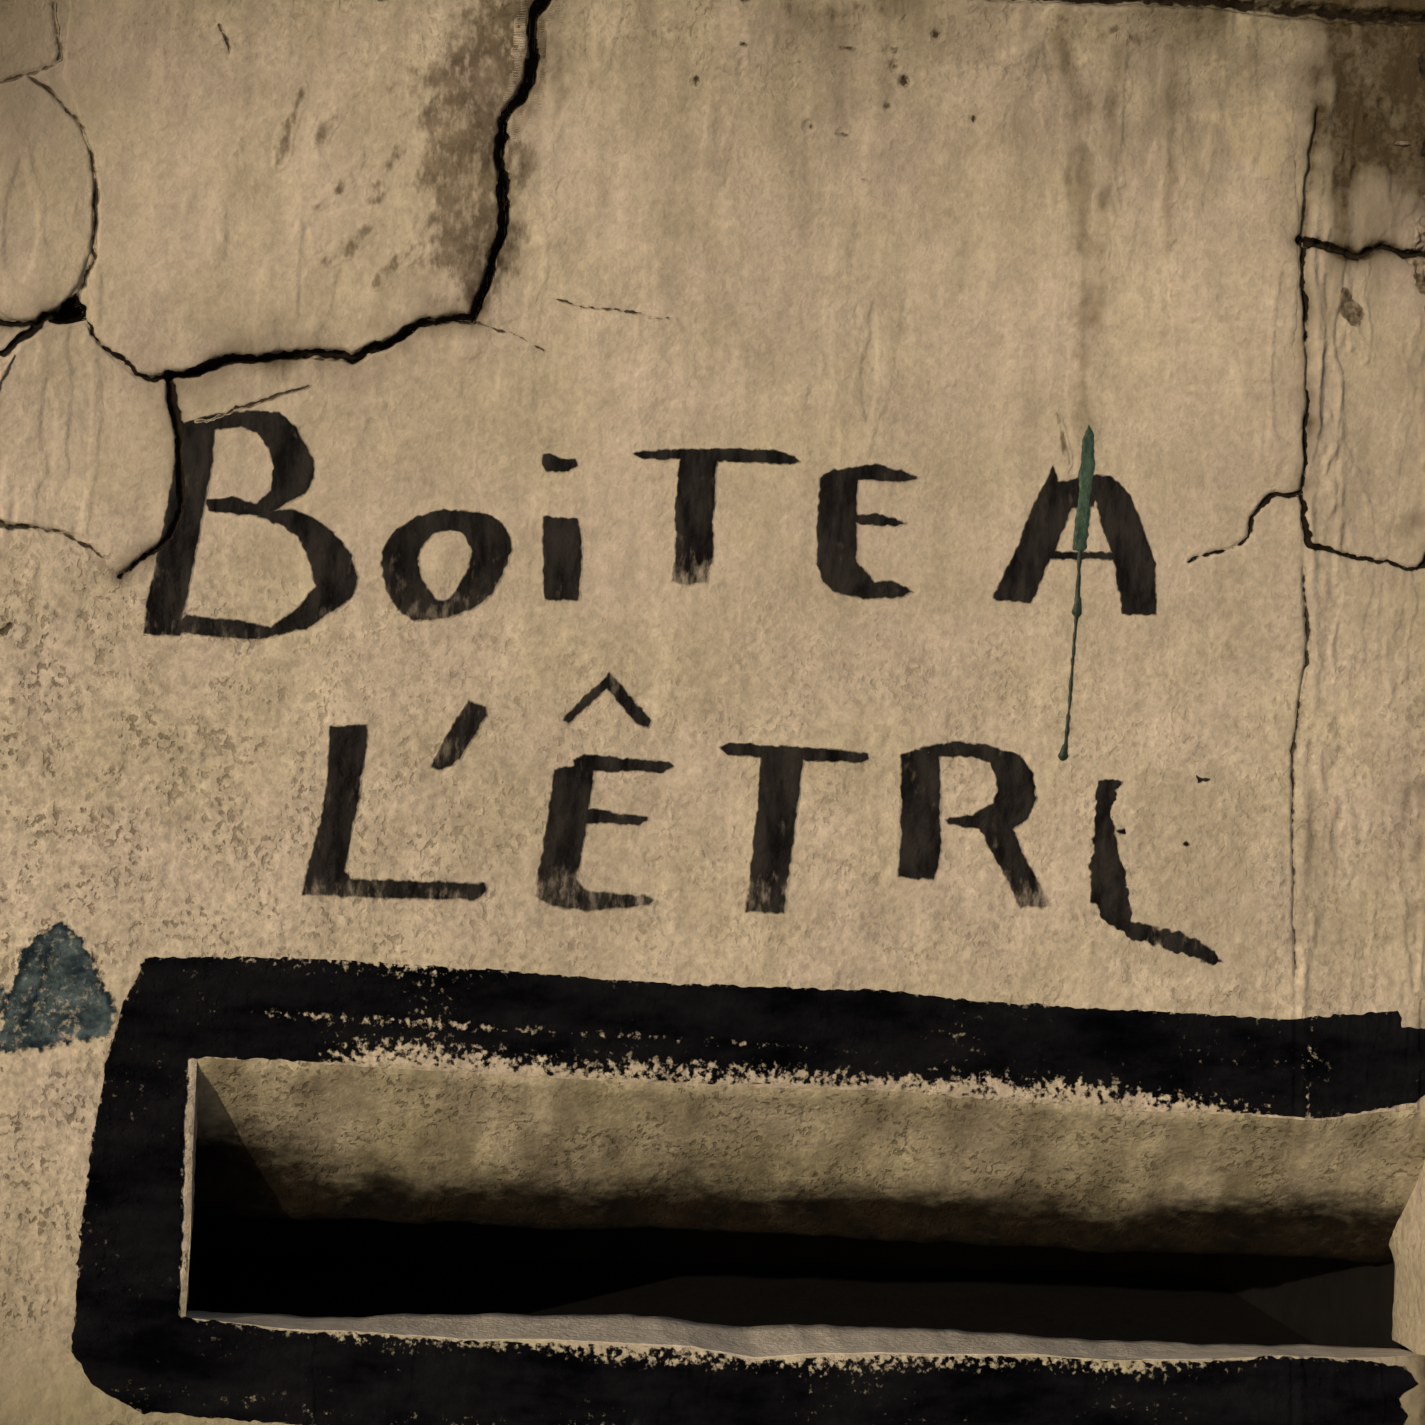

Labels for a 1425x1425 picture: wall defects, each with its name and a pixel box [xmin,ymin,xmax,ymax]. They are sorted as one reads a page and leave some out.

crack [0,0,551,579]
water stain [271,0,598,360]
crack [551,297,670,320]
spalling [1406,195,1425,310]
crack [0,621,13,636]
crack [1187,109,1425,978]